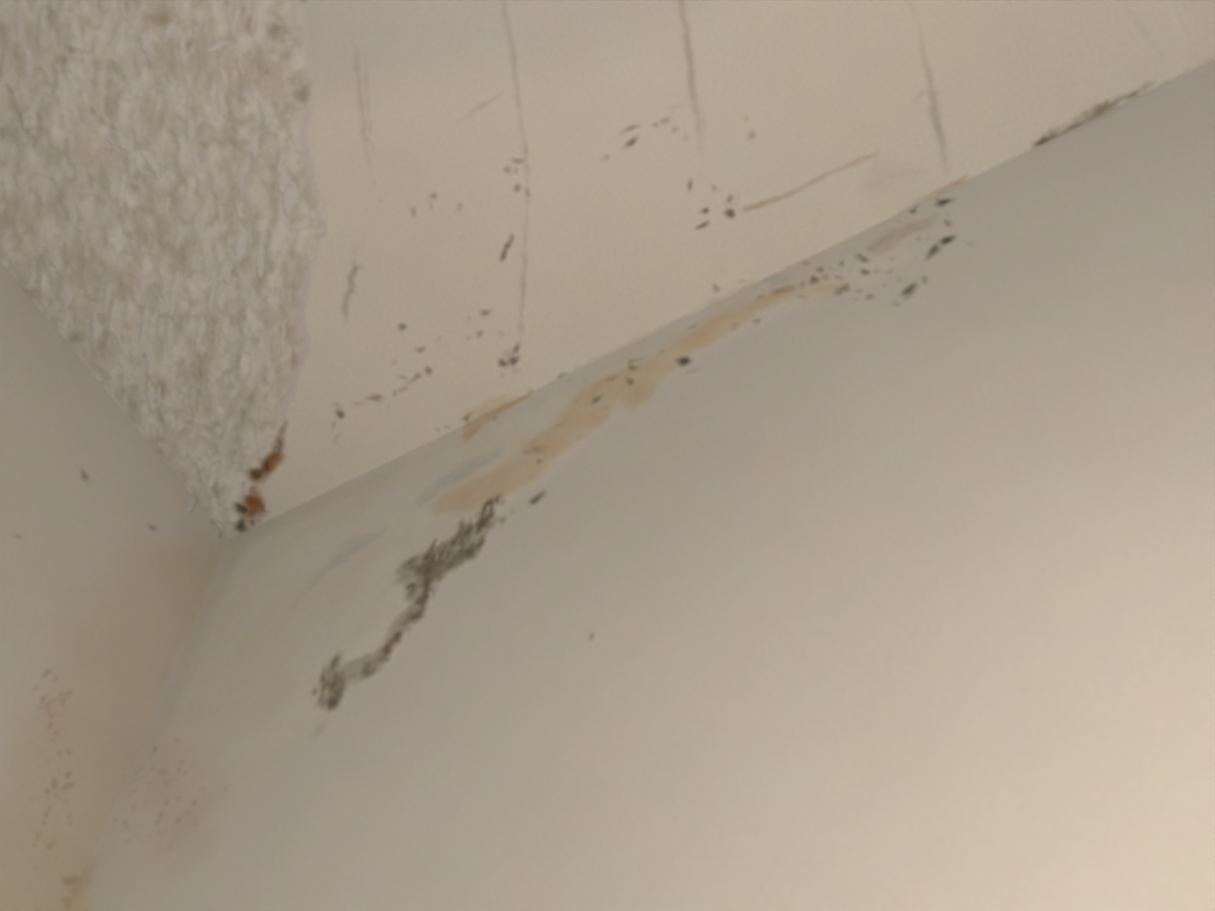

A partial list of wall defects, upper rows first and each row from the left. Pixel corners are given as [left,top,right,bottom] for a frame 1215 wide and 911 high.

crack [674,0,709,164]
damp [257,0,1215,518]
corrosion [237,418,294,534]
damp [306,489,553,743]